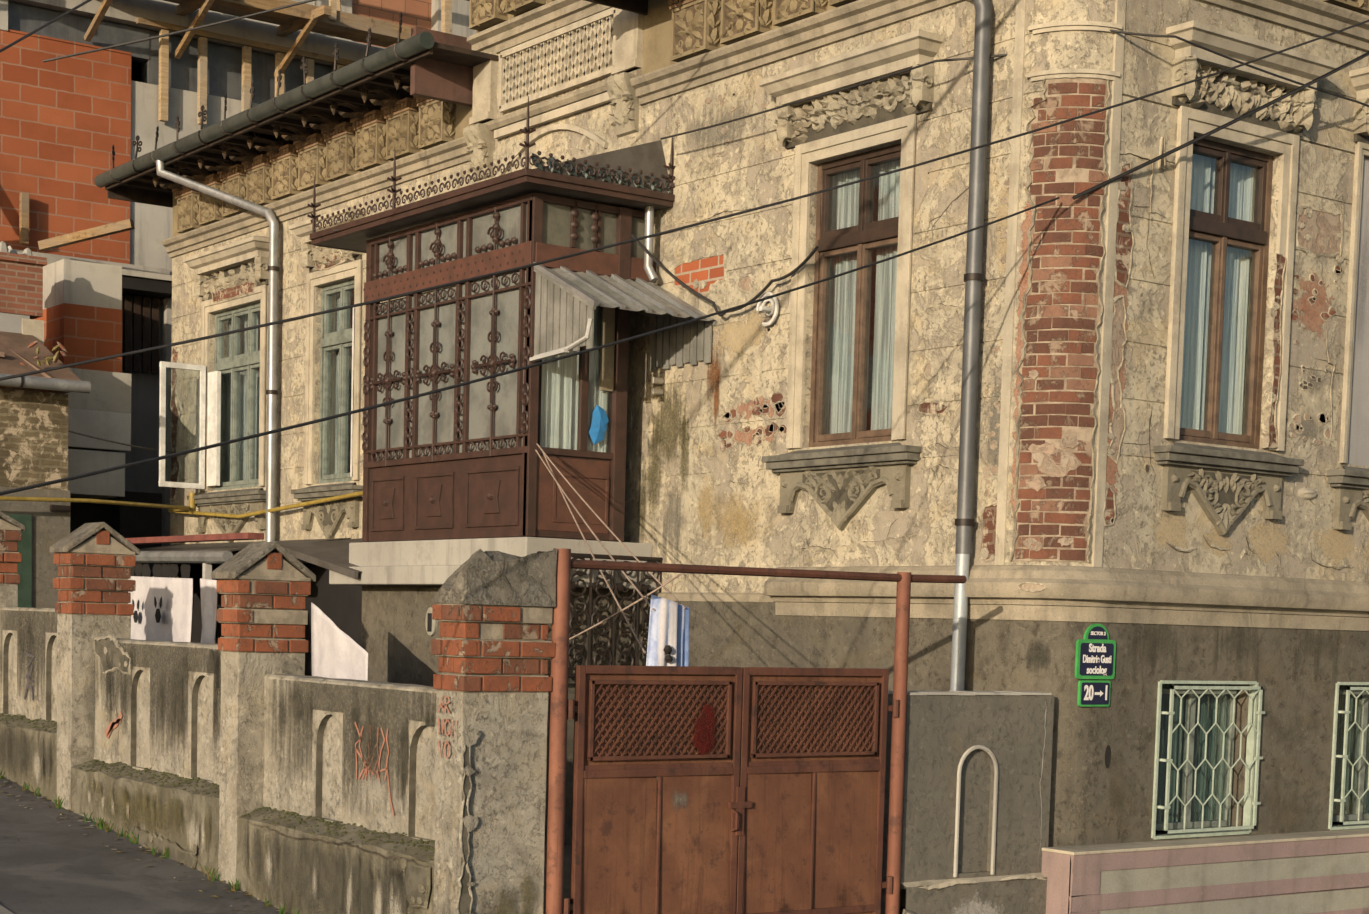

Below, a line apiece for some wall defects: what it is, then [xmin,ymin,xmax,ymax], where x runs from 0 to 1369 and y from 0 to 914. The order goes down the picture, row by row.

flaking render [673,252,755,297]
peeling [712,305,775,356]
flaking render [980,77,1134,563]
flaking render [1261,204,1344,450]
peeling [717,391,787,453]
leakage [639,395,689,552]
leakage [87,643,221,743]
leakage [243,828,406,914]